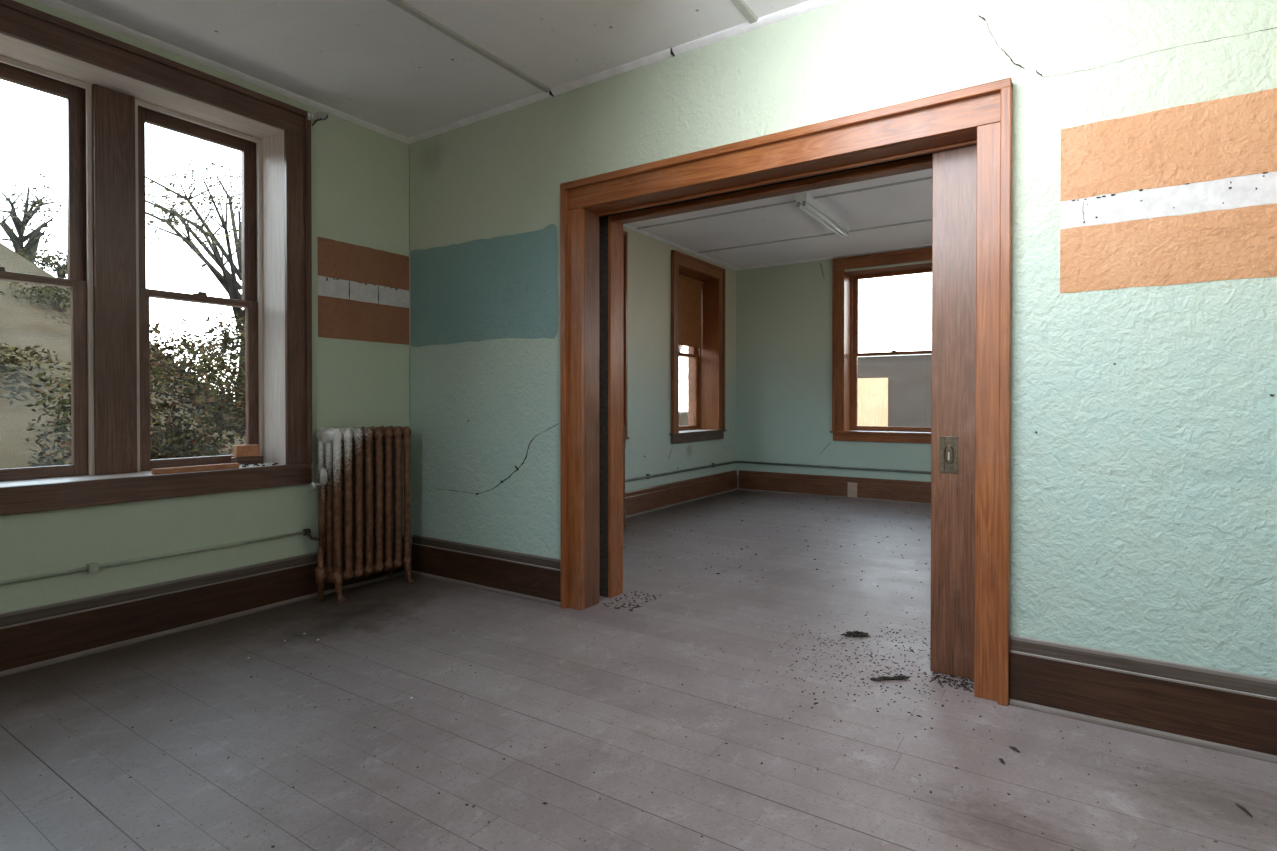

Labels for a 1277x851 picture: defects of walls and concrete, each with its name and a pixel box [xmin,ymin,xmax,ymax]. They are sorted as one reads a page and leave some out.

crack [978,15,1277,77]
crack [435,423,559,495]